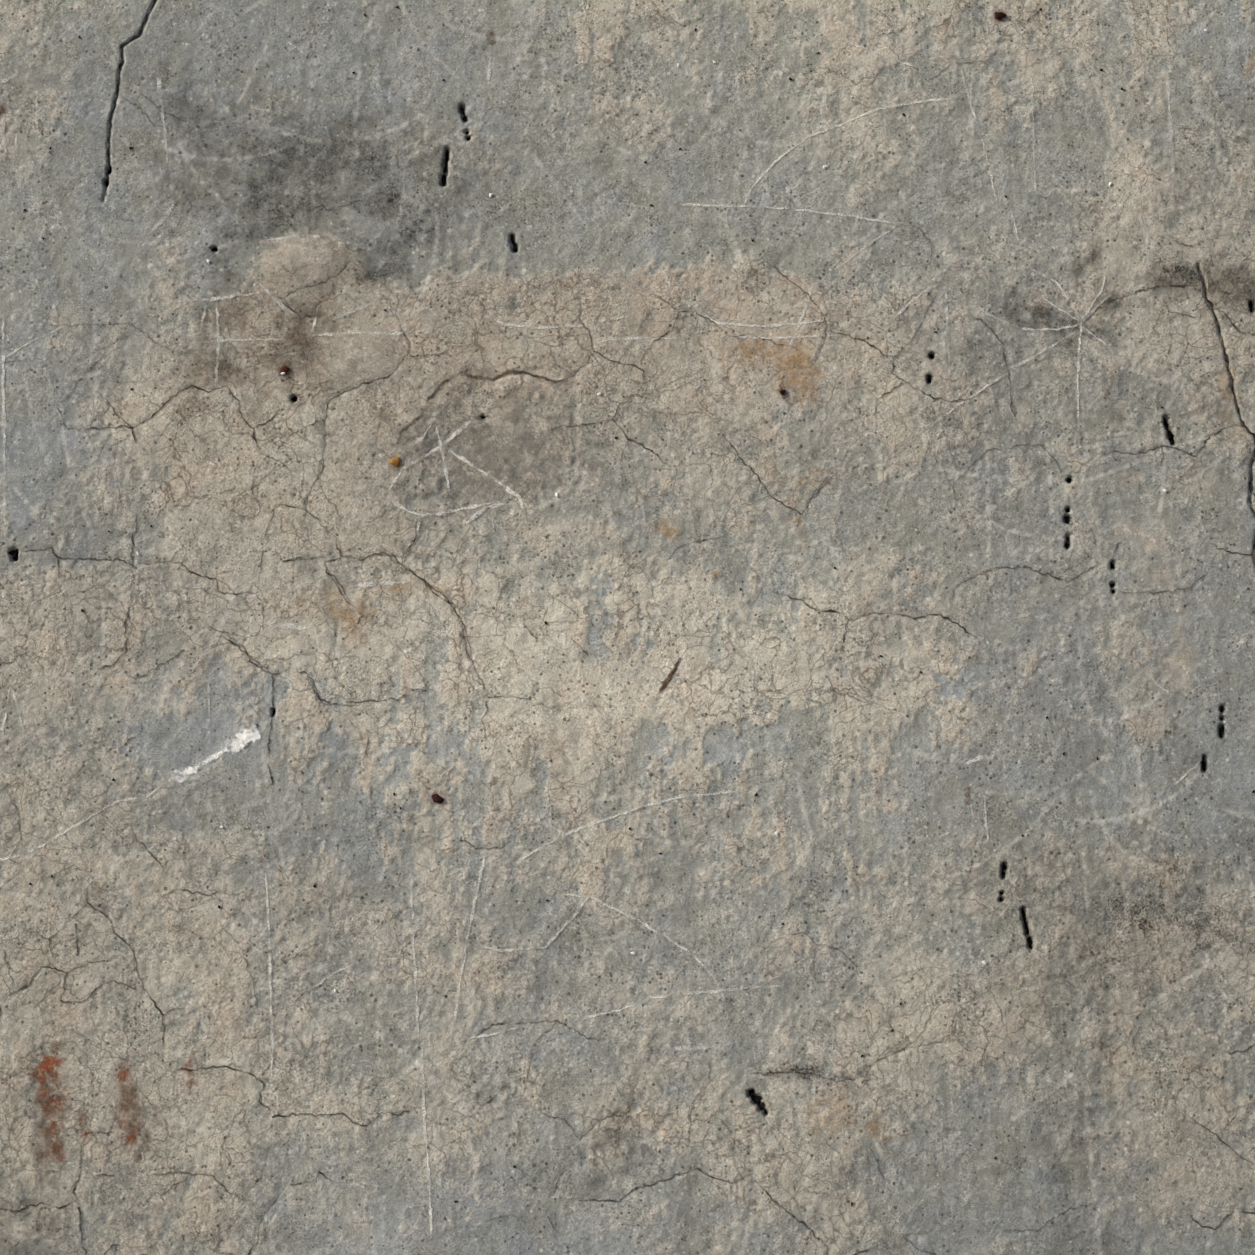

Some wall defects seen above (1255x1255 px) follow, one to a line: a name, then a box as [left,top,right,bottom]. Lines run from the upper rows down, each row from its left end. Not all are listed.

crack [105,0,157,193]
crack [25,354,501,731]
crack [567,296,714,458]
crack [730,444,832,514]
crack [788,595,970,647]
crack [773,266,1081,471]
crack [1087,275,1255,594]
crack [209,626,419,785]
crack [0,899,410,1126]
corrosion [34,1056,64,1159]
crack [15,1160,146,1255]
crack [555,1168,868,1255]